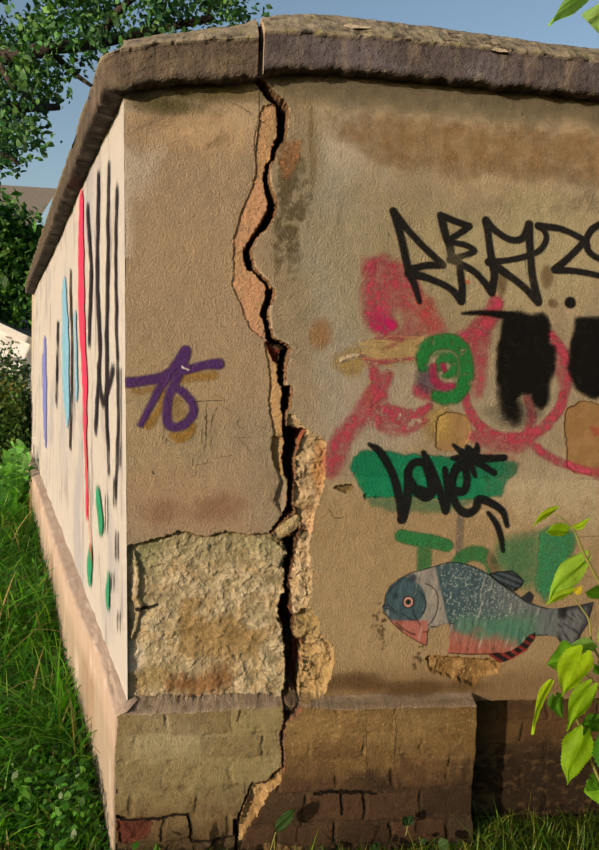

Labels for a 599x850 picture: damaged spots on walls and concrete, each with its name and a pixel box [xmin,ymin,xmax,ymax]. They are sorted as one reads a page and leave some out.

spalling [126,103,353,705]
peeling [426,409,451,438]
crack [116,78,306,850]
spalling [425,654,501,689]
spalling [238,768,282,840]